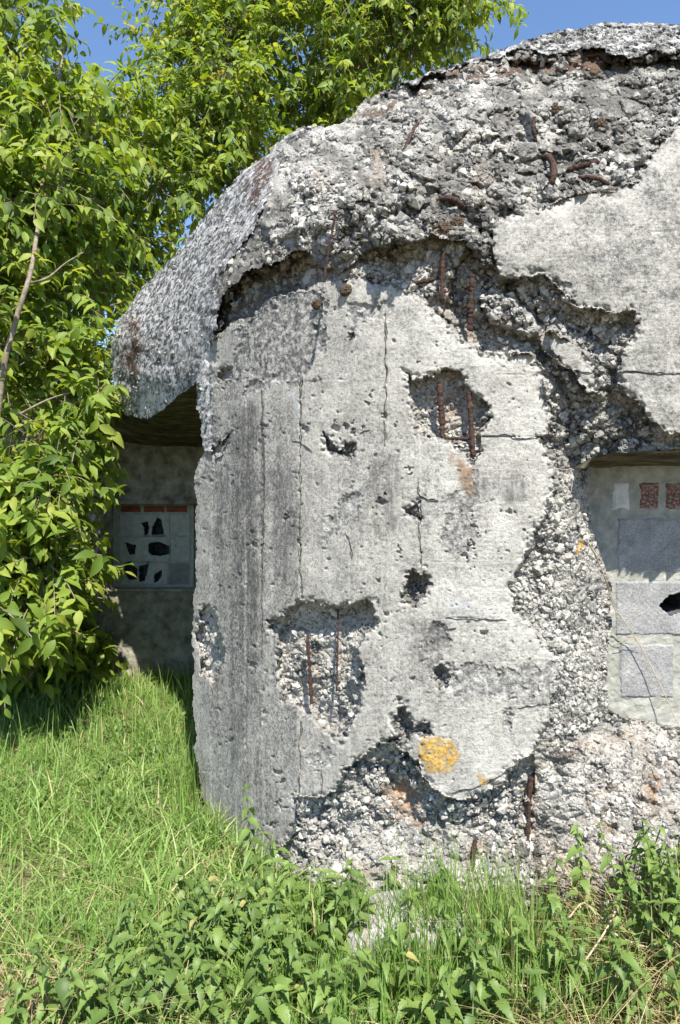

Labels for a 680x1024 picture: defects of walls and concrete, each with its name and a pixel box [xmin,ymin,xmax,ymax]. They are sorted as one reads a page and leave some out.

crack [294,366,309,593]
spalling [113,24,680,922]